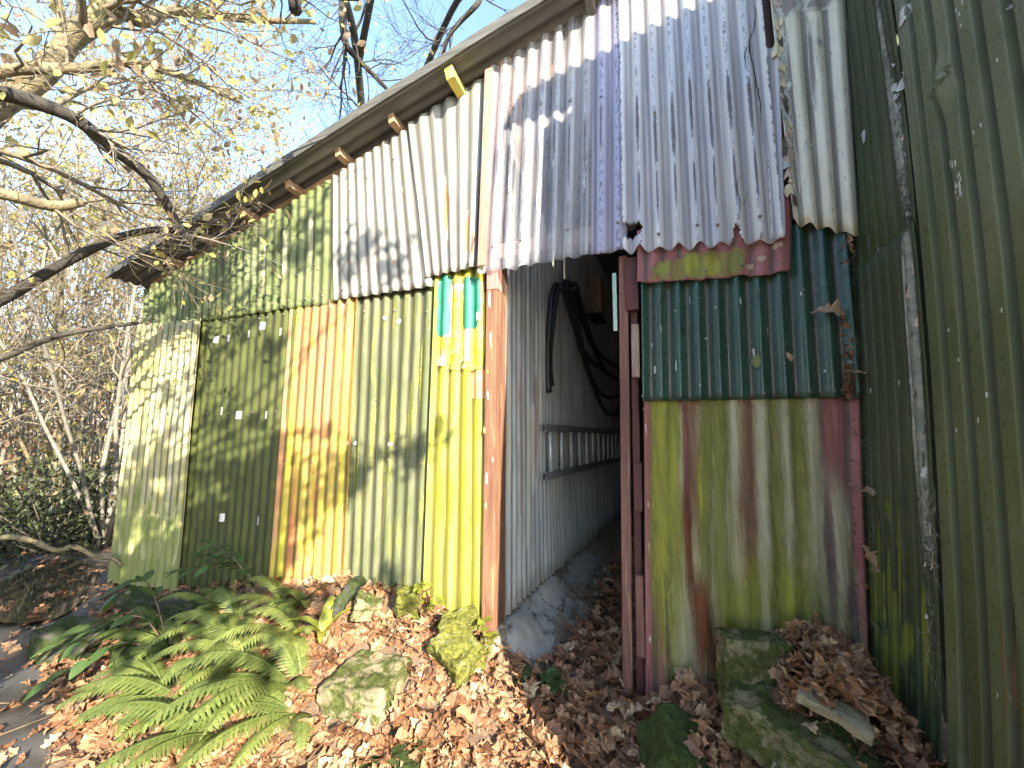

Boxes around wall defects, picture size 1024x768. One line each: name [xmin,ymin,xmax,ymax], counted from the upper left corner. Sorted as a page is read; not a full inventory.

crack [739,3,763,142]
peeling [875,0,934,619]
rust [682,493,718,681]